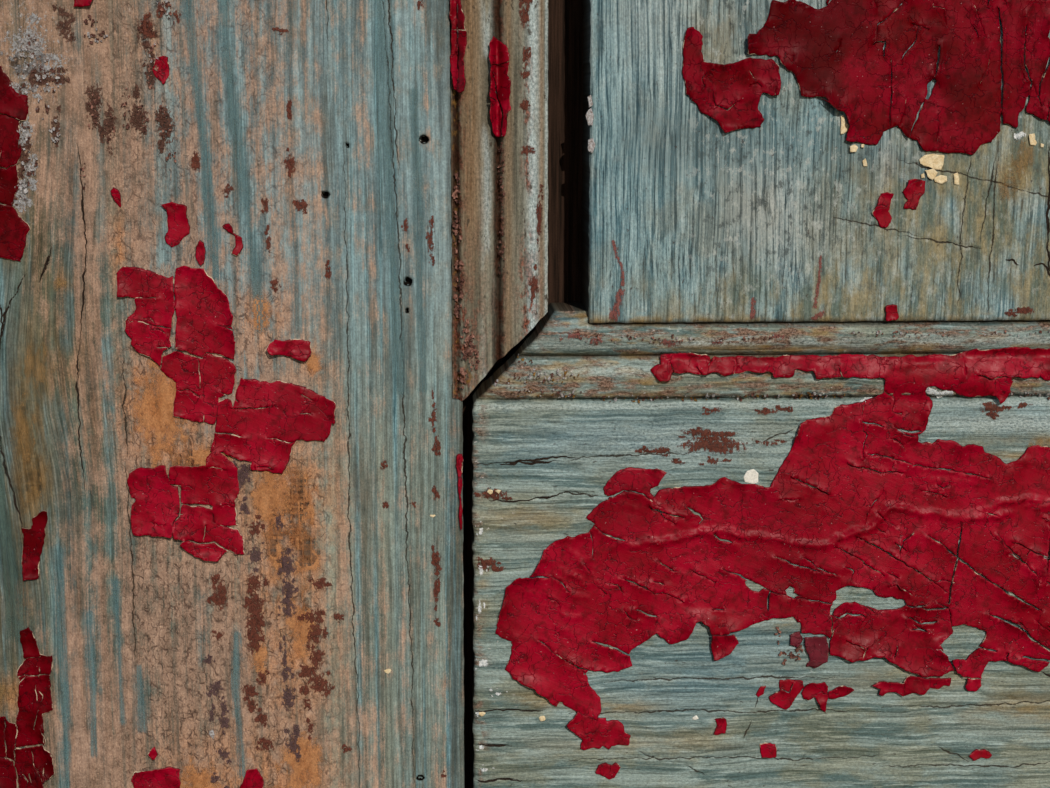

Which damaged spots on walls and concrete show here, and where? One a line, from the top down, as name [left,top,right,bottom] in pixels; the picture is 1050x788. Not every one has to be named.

peeling [0,29,61,262]
peeling [449,0,467,93]
peeling [682,0,1050,228]
crack [833,139,1050,310]
peeling [117,202,336,562]
peeling [21,511,48,581]
peeling [494,330,1050,750]
peeling [0,627,55,788]
crack [478,741,510,749]
crack [477,776,522,784]
crack [475,706,543,714]
crack [568,672,1050,775]